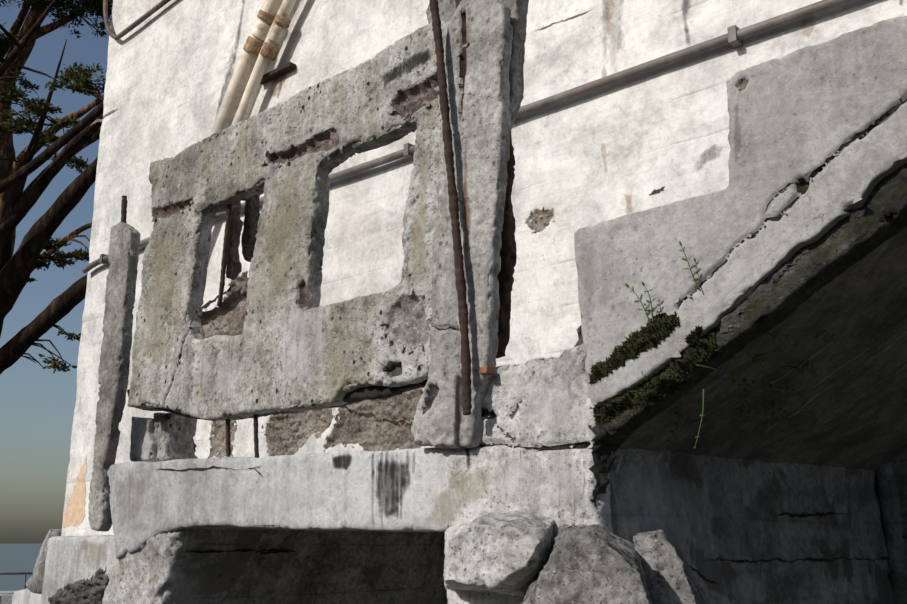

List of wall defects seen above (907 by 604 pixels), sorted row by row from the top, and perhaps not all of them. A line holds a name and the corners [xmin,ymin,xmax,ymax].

crack [535,9,592,31]
crack [675,96,907,310]
spalling [524,206,554,233]
corrosion [496,130,517,359]
spalling [253,289,439,458]
crack [156,466,262,476]
water stain [371,452,414,516]
crack [776,511,851,519]
crack [189,547,296,555]
crack [689,556,889,584]